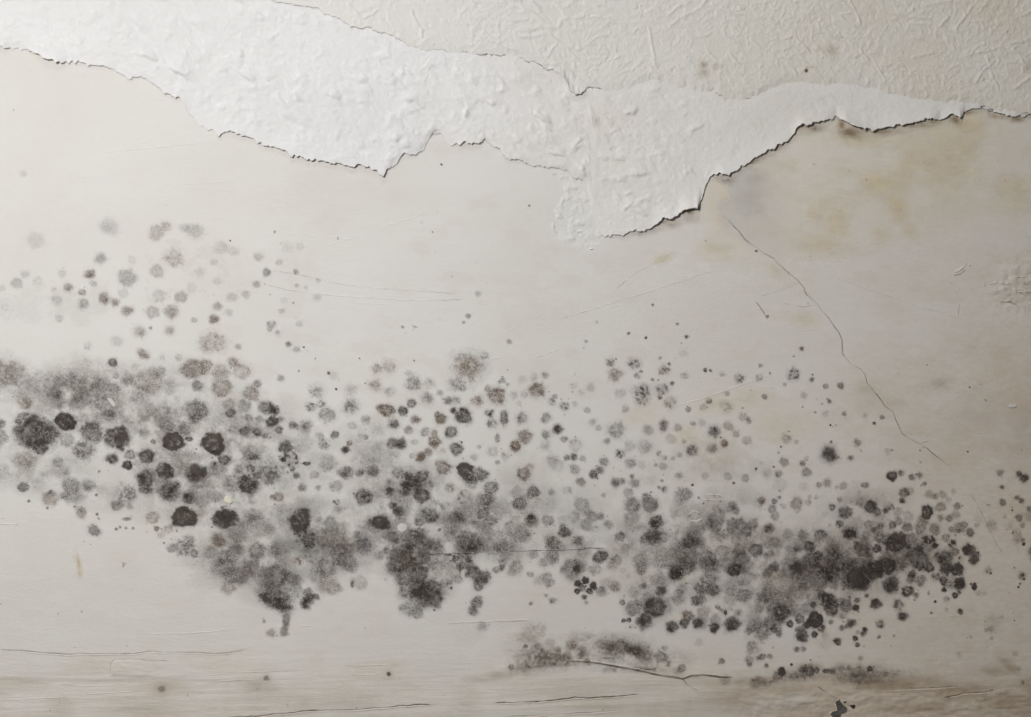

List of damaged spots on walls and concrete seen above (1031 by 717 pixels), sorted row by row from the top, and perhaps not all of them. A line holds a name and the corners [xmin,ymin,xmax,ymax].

leakage [0,378,310,527]
leakage [476,378,532,451]
leakage [822,441,852,461]
leakage [369,388,504,615]
leakage [211,507,366,635]
leakage [548,527,582,557]
leakage [564,471,979,651]
leakage [525,644,587,668]
leakage [602,643,664,670]
leakage [746,655,835,683]